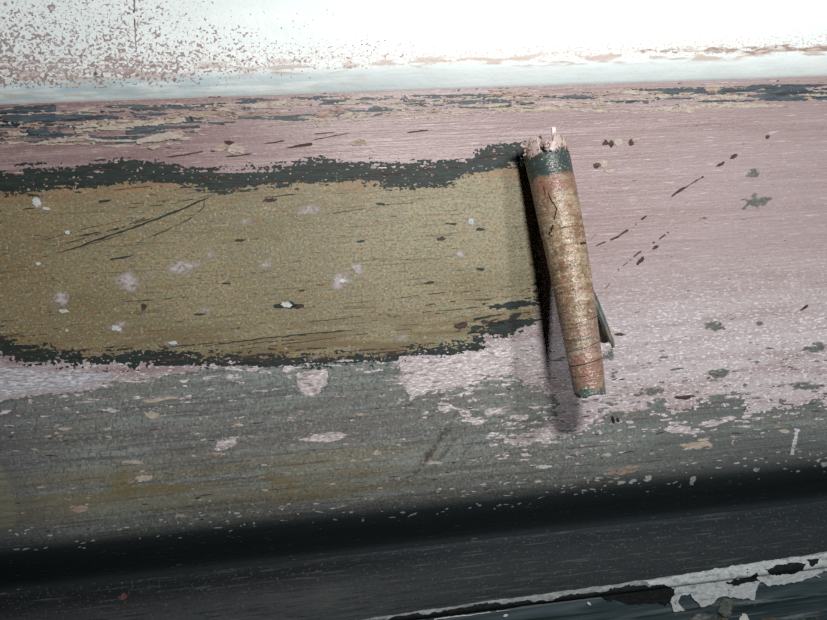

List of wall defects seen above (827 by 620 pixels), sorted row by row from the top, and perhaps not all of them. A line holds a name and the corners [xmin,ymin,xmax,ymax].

peeling [0,79,827,150]
peeling [211,140,246,154]
peeling [520,135,549,156]
peeling [593,160,614,173]
peeling [697,317,736,331]
peeling [0,335,827,583]
peeling [601,553,827,612]